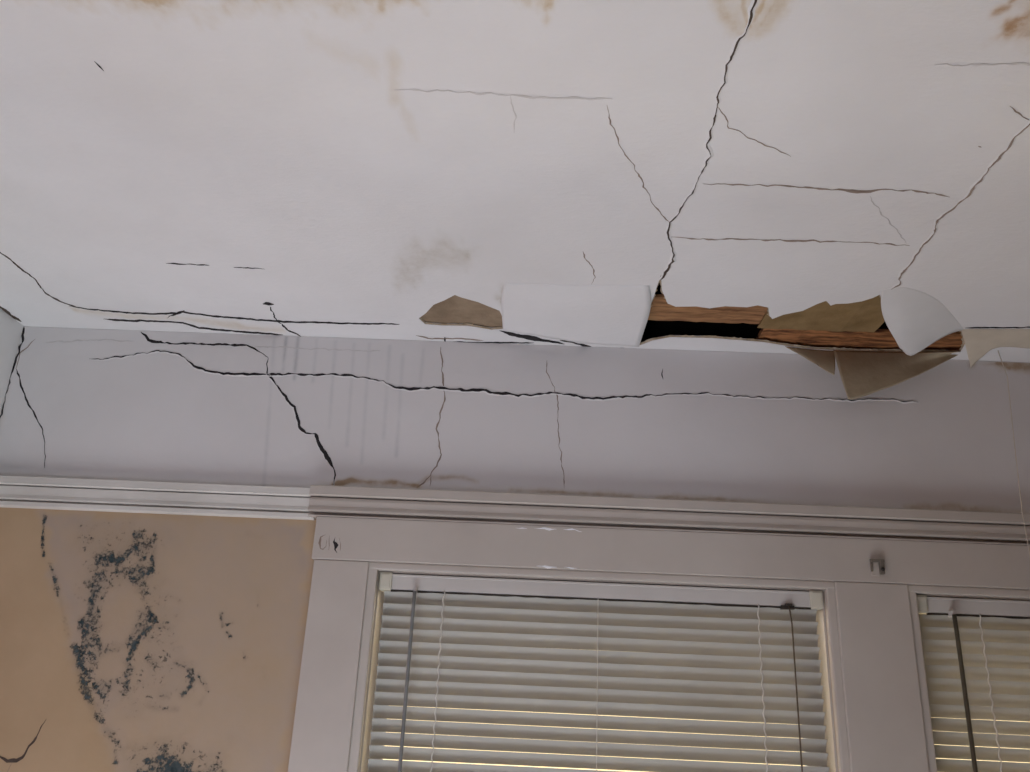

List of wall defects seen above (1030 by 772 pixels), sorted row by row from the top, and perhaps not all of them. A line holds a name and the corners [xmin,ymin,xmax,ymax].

damp [11,0,445,144]
damp [703,0,802,46]
crack [398,0,1030,290]
crack [0,252,919,487]
spalling [419,295,503,330]
spalling [640,276,1030,400]
crack [970,323,1030,331]
damp [32,509,316,772]
crack [0,720,46,772]